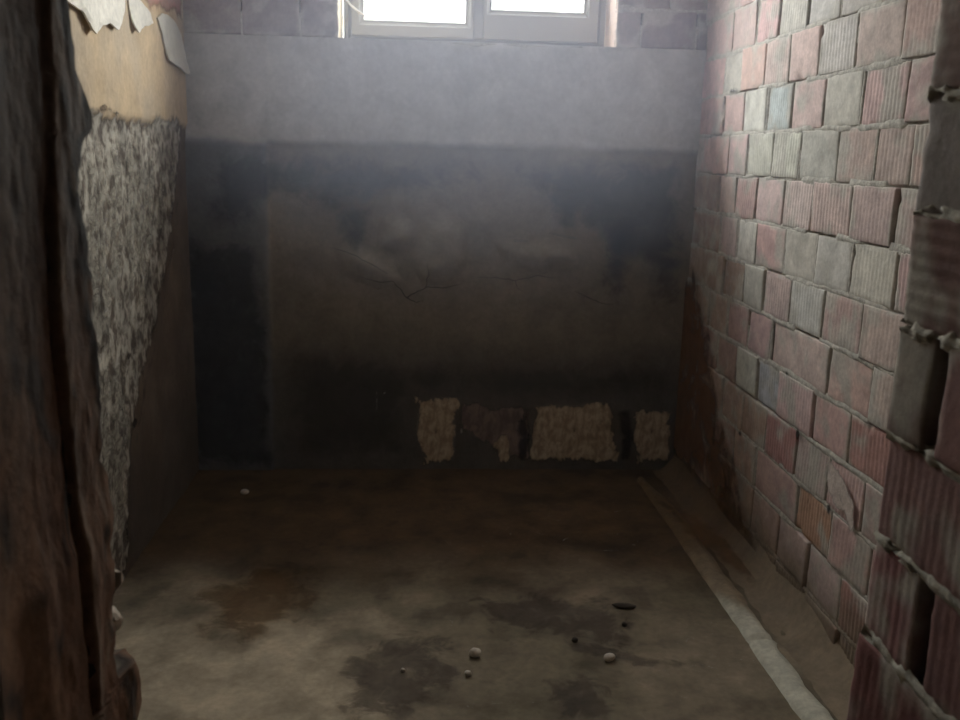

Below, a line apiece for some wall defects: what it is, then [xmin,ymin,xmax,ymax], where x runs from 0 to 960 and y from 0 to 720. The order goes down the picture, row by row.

peeling [68,0,190,74]
peeling [414,396,620,465]
peeling [633,409,671,464]